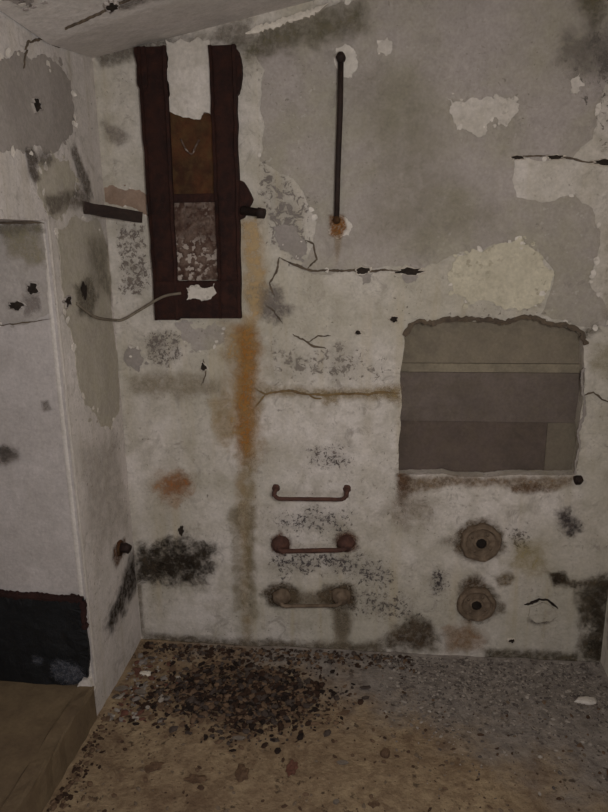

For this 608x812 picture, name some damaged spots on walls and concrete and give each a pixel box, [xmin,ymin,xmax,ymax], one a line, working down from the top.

peeling [255,0,608,345]
crack [524,155,594,163]
peeling [0,48,149,430]
corrosion [330,216,346,238]
crack [265,240,399,349]
corrosion [227,222,265,519]
water stain [108,538,215,631]
crack [524,598,558,609]
water stain [486,573,608,661]